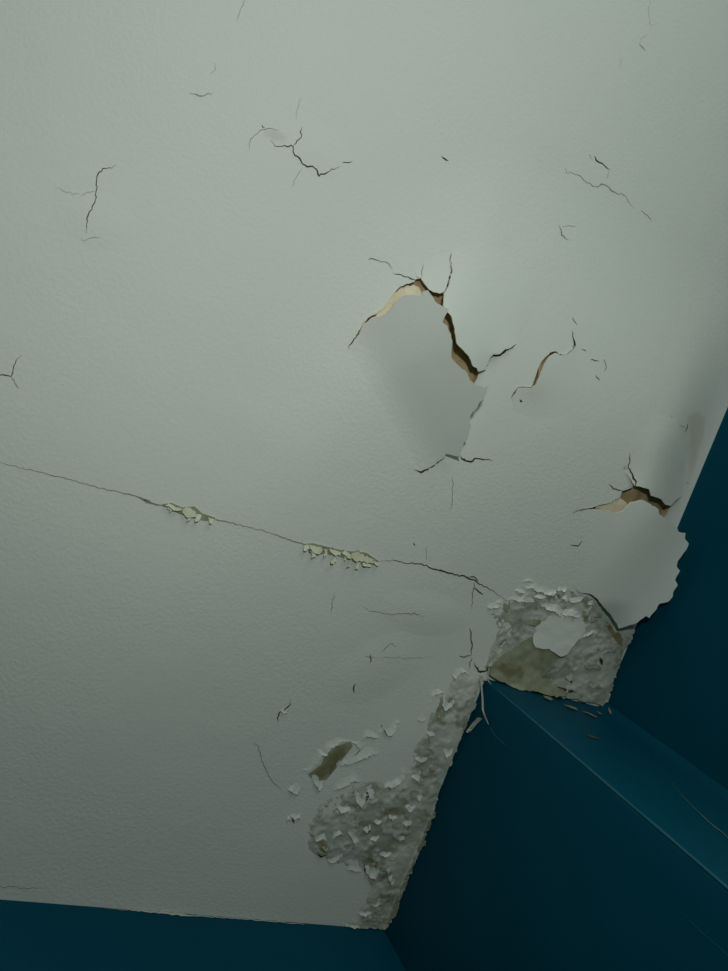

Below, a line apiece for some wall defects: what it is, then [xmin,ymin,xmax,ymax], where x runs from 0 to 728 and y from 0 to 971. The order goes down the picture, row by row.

crack [249,101,352,186]
crack [58,165,116,241]
crack [566,155,649,217]
crack [511,317,607,419]
crack [1,462,166,507]
peeling [163,503,215,524]
crack [215,519,303,544]
peeling [303,543,381,569]
flaking render [285,578,635,930]